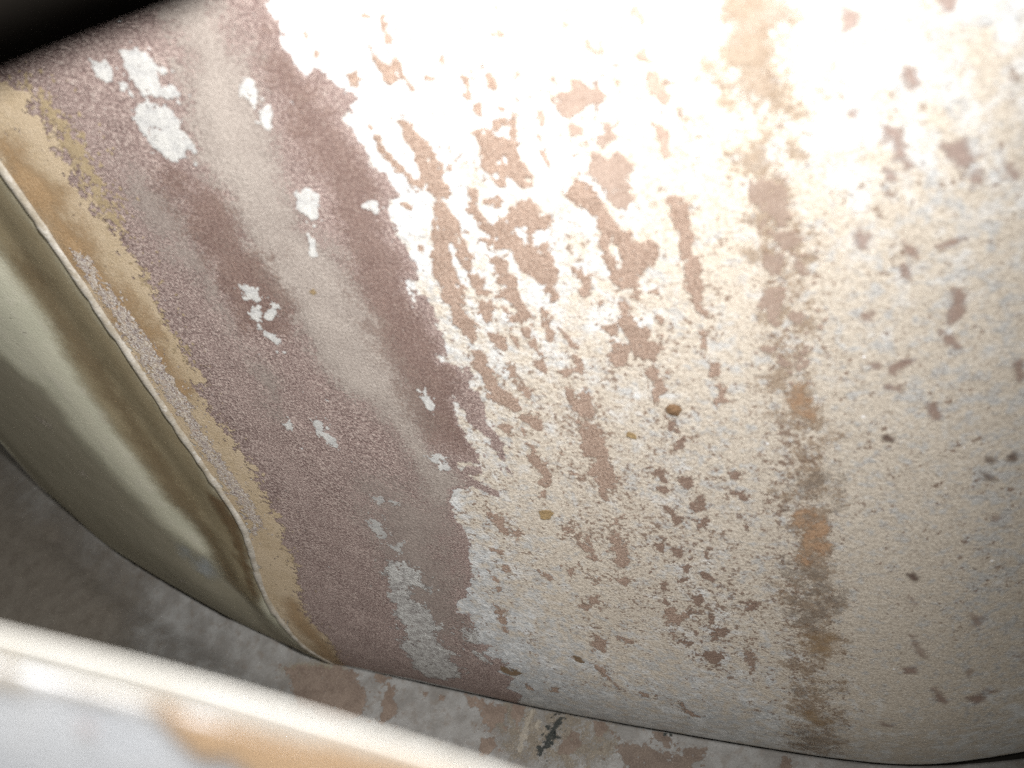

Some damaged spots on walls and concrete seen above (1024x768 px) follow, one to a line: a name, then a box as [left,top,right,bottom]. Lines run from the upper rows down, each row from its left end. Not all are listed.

peeling [89,41,197,166]
peeling [239,77,273,130]
peeling [294,187,322,257]
peeling [362,196,379,214]
peeling [238,284,286,354]
peeling [310,416,341,451]
peeling [416,387,435,415]
peeling [423,453,452,471]
rust [701,0,850,756]
peeling [365,494,505,681]